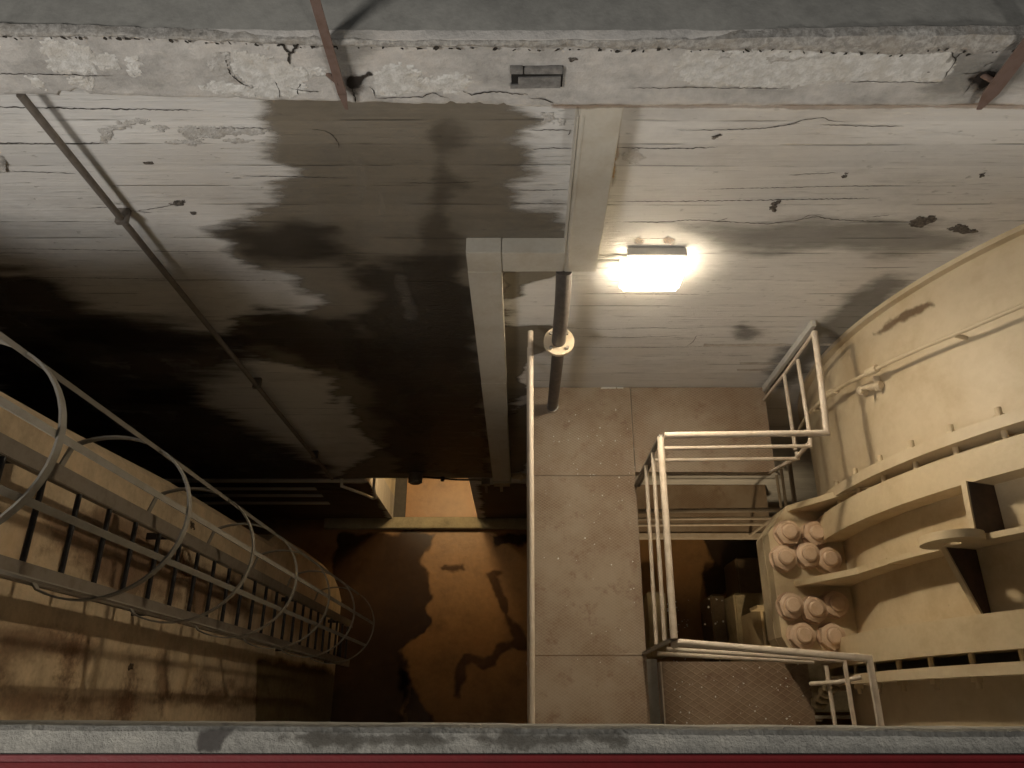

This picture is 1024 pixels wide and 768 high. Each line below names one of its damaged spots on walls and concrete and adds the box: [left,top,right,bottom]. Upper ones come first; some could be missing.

flaking render [2,36,150,92]
flaking render [198,41,327,100]
crack [275,43,318,98]
flaking render [598,48,998,92]
spalling [909,215,937,228]
spalling [947,224,978,234]
damp [0,100,565,520]
damp [493,533,527,546]
damp [455,571,527,696]